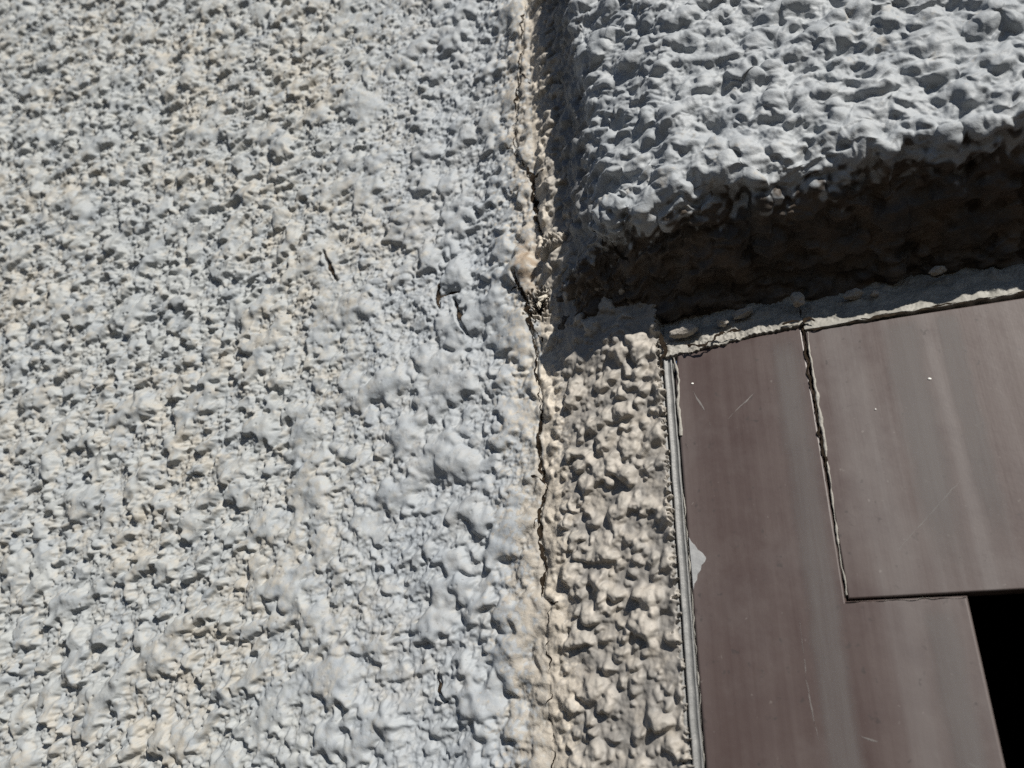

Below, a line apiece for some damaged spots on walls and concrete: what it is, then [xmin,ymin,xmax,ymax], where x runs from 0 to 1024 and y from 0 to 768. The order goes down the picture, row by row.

crack [506,0,544,236]
crack [511,272,559,768]